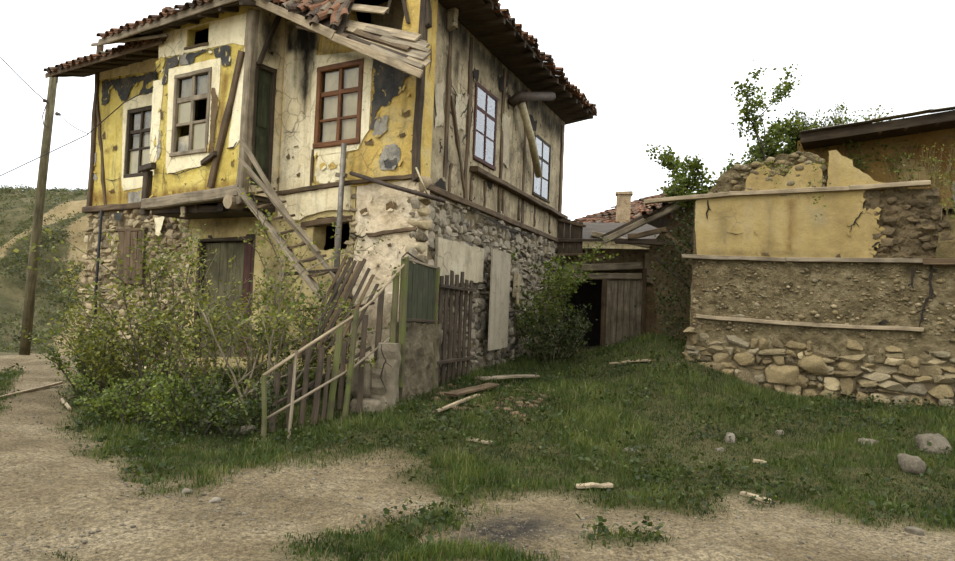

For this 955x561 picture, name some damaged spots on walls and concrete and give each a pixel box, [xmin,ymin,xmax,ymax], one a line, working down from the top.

peeling [101,45,231,105]
peeling [363,58,412,170]
flaking render [860,154,955,259]
crack [908,265,937,327]